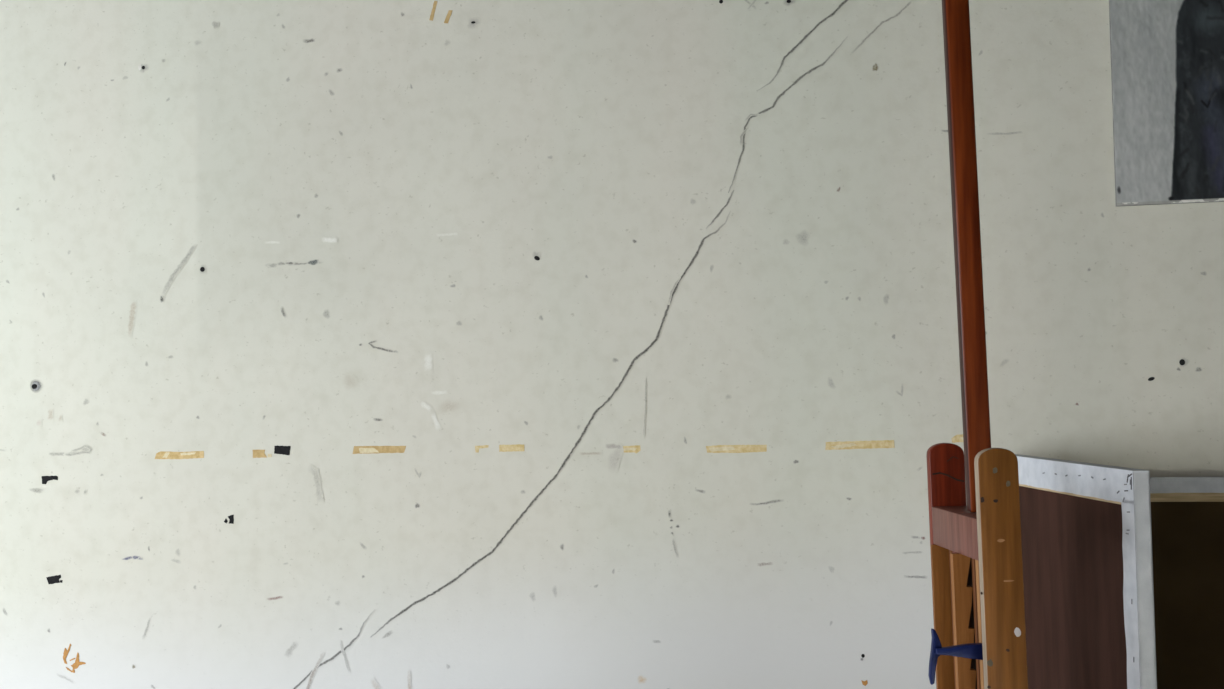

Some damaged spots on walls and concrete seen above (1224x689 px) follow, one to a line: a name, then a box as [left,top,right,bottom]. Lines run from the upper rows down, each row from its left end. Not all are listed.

crack [293,0,913,689]